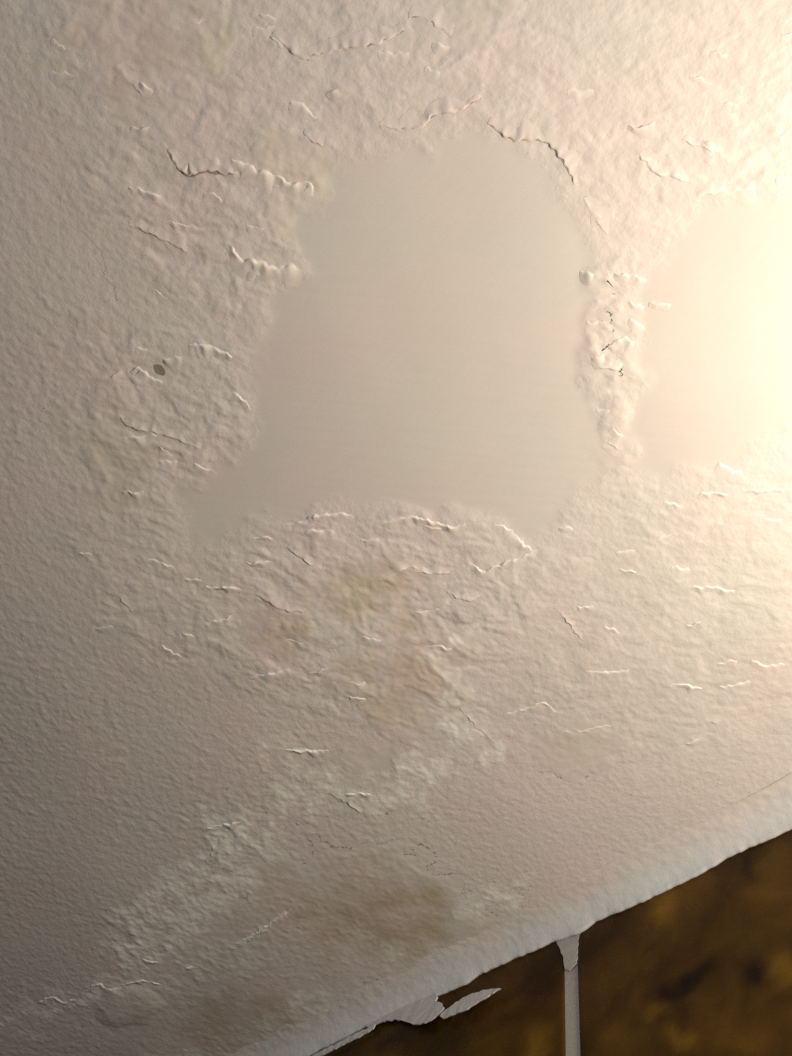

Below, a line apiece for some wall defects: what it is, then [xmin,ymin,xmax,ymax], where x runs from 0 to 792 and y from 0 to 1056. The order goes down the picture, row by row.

peeling [148,0,792,798]
damp [0,549,539,1056]
peeling [440,988,501,1019]